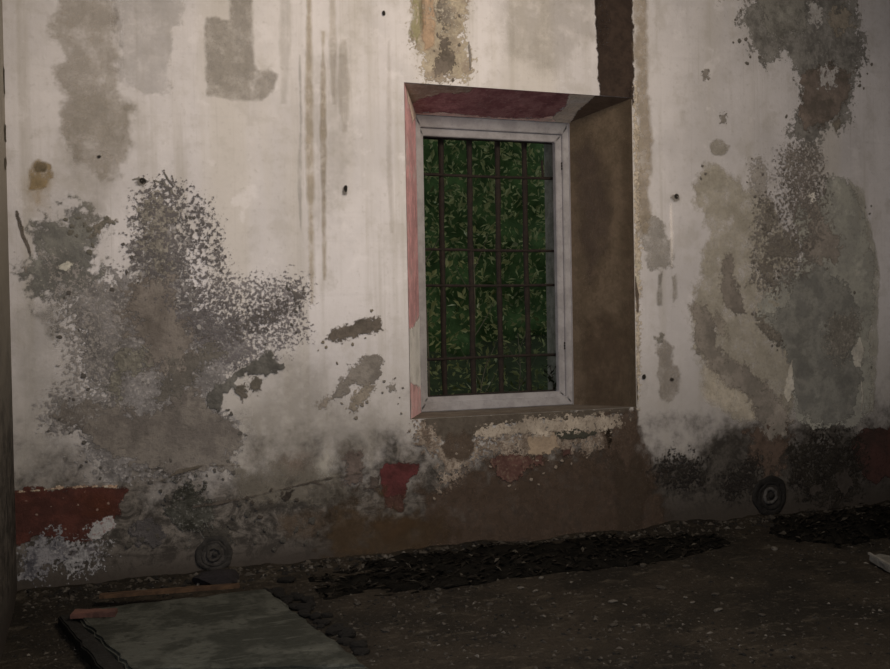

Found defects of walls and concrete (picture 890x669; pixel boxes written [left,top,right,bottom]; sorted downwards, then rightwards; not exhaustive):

flaking render [14,170,320,588]
water stain [235,455,346,507]
water stain [689,139,798,442]
flaking render [646,0,890,506]